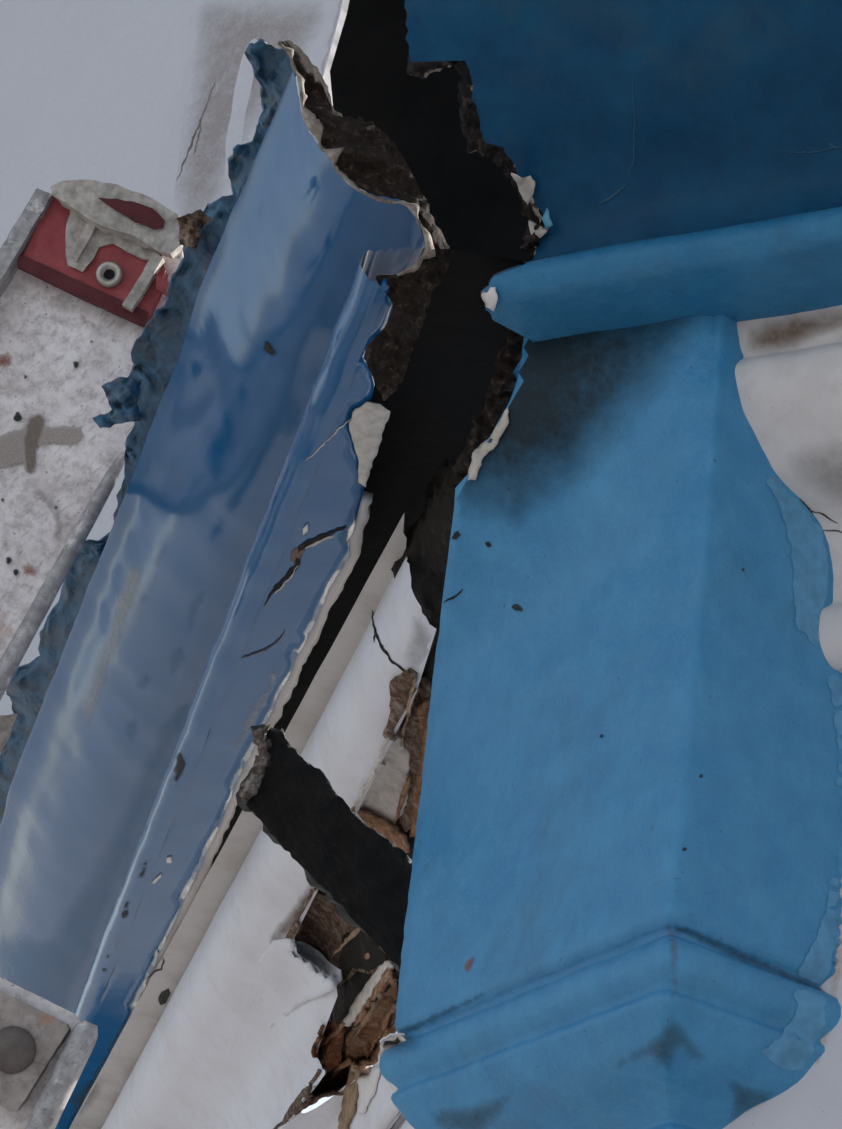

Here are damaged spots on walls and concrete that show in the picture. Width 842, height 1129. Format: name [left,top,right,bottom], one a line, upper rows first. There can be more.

spalling [274,0,553,733]
crack [264,526,346,606]
crack [241,630,285,659]
crack [371,611,405,671]
peeling [175,753,185,781]
spalling [205,805,242,878]
peeling [225,938,342,1047]
peeling [338,1033,406,1129]